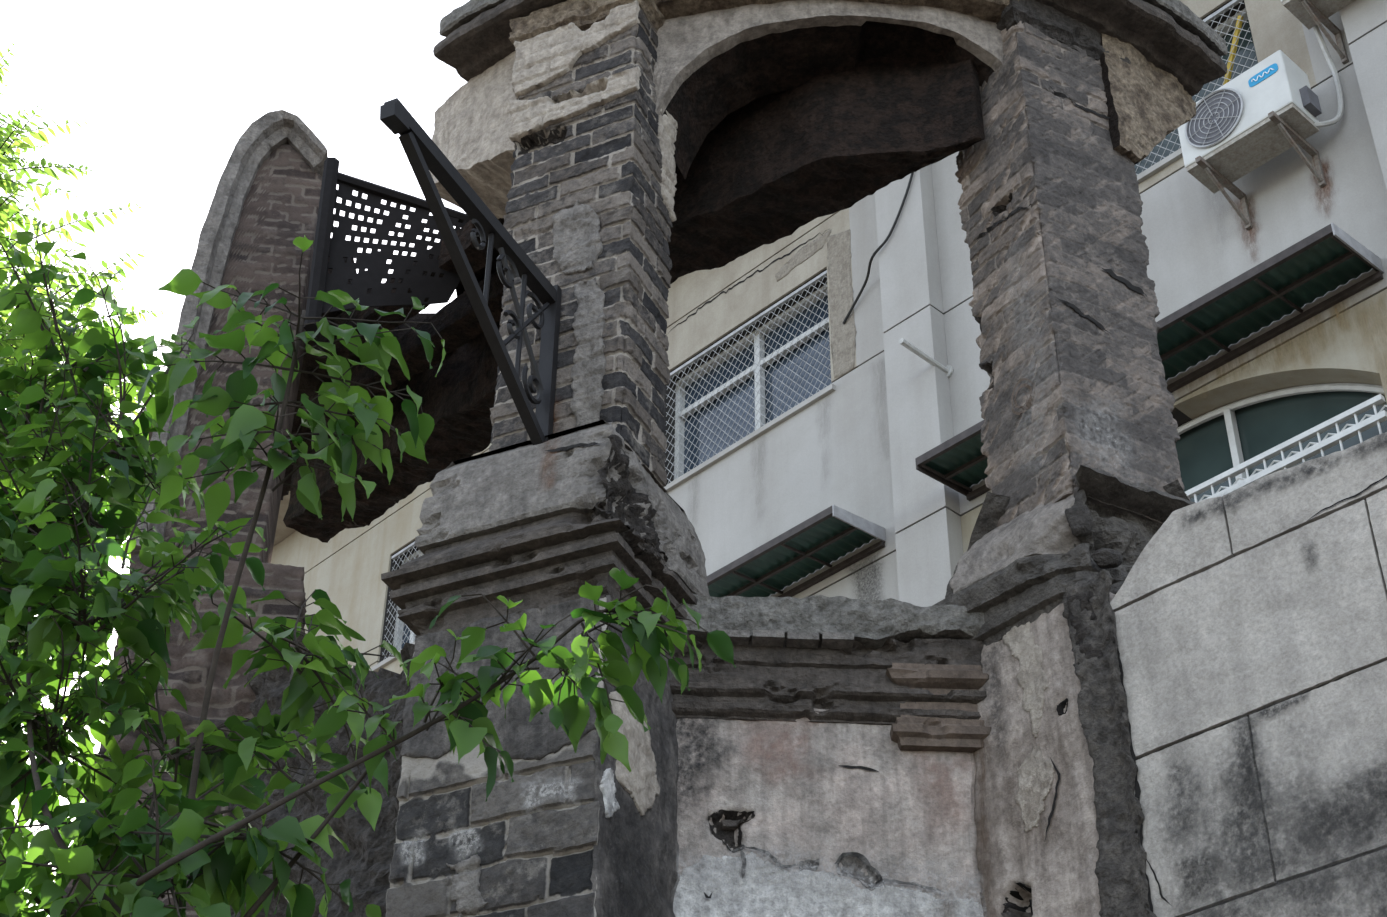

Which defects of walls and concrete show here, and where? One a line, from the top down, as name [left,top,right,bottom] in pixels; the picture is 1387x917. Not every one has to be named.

flaking render [600,691,660,818]
flaking render [673,809,1033,917]
spalling [1002,548,1157,917]
damp [1181,721,1387,917]